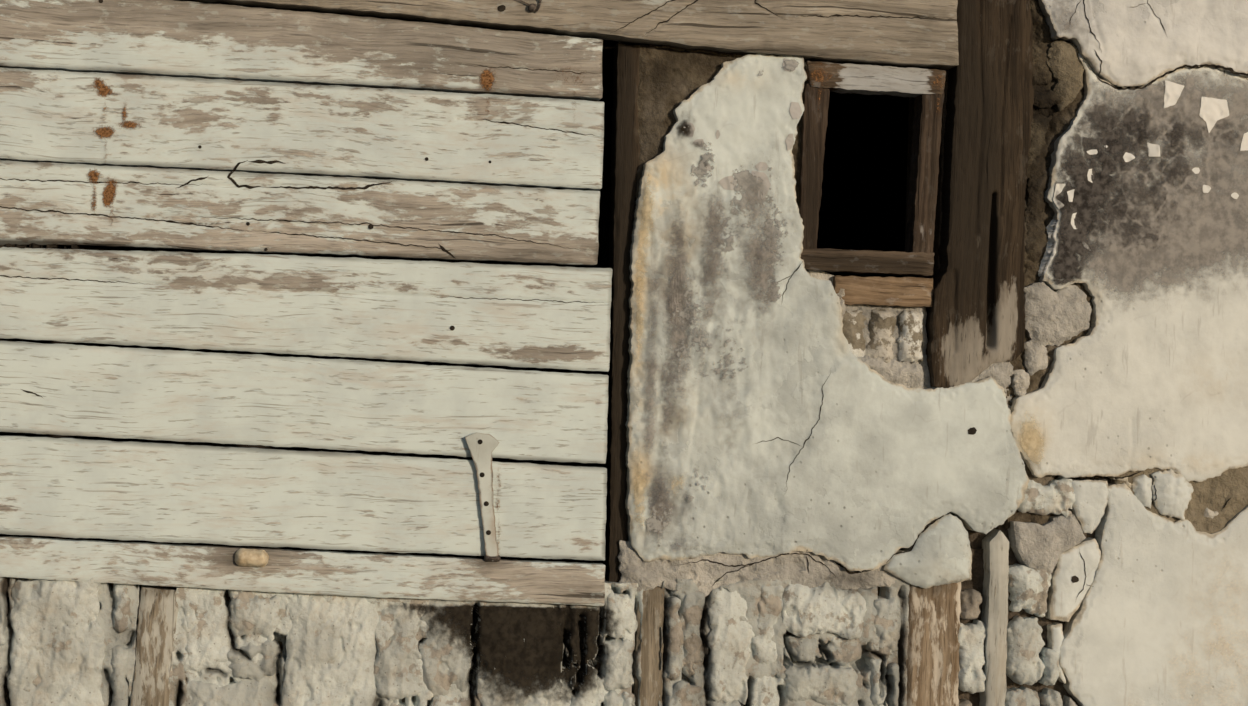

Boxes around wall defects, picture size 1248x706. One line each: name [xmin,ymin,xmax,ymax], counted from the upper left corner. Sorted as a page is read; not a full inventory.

crack [1070,0,1248,90]
rust [94,78,112,110]
rust [93,107,140,139]
rust [479,70,495,90]
peeling [1123,143,1160,162]
water stain [1166,120,1183,170]
peeling [1199,97,1229,133]
rust [88,170,116,221]
spalling [967,0,1093,410]
spalling [807,271,938,389]
crack [752,369,831,489]
spalling [1004,466,1248,706]